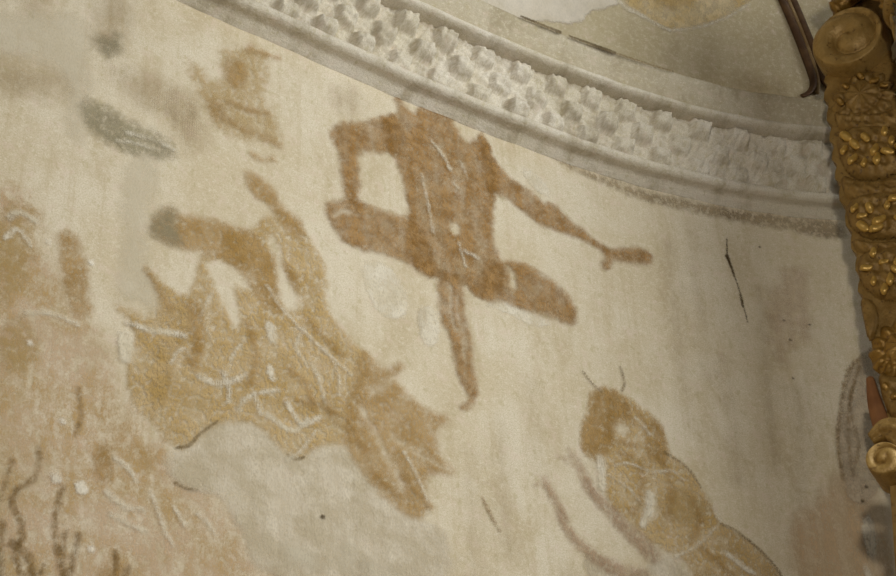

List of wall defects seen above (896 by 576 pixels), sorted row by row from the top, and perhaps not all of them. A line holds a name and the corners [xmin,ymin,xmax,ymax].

flaking render [482,0,618,24]
crack [520,15,674,72]
crack [725,239,747,320]